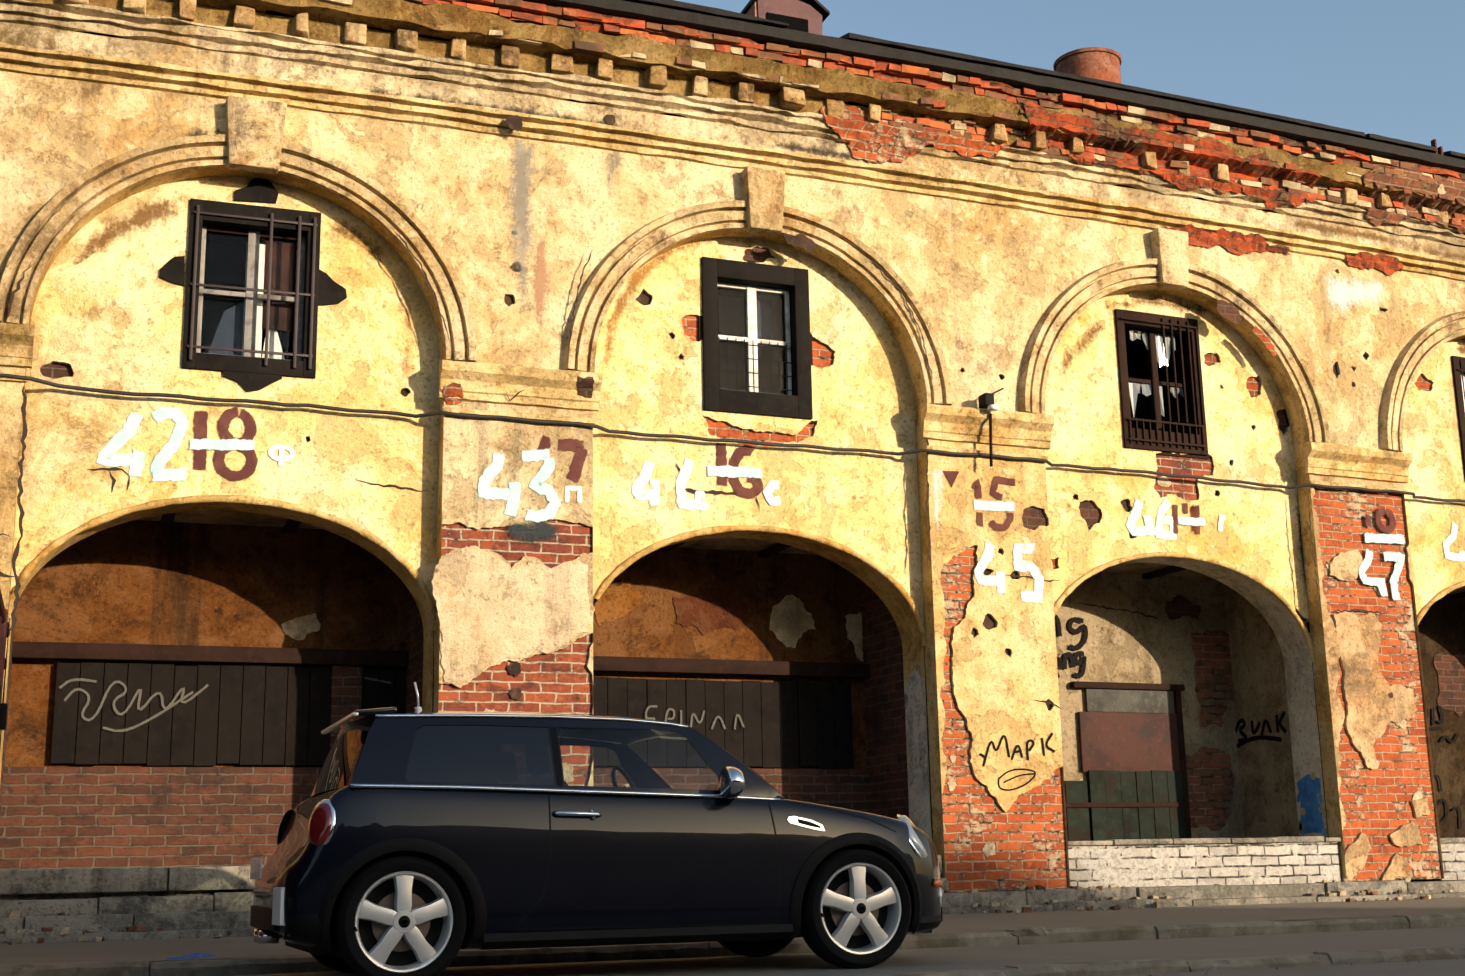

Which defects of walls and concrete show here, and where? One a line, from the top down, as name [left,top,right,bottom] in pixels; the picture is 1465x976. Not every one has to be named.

flaking render [669,314,699,360]
flaking render [810,332,835,369]
flaking render [703,416,818,447]
crack [0,386,28,636]
flaking render [441,519,593,569]
flaking render [1154,453,1234,502]
flaking render [438,581,643,715]
flaking render [904,545,1068,892]
flaking render [1165,595,1234,727]
flaking render [1296,487,1465,881]
flaking render [560,746,593,786]
flaking render [1186,746,1235,831]